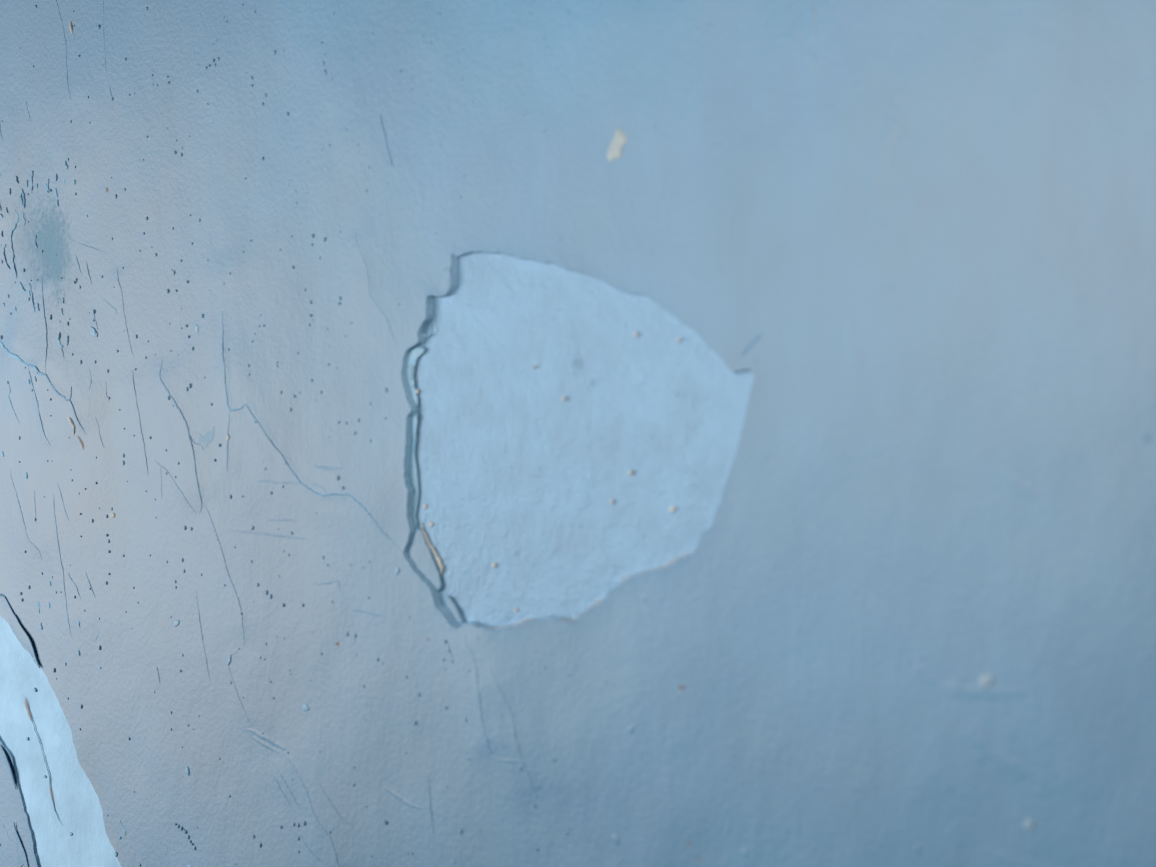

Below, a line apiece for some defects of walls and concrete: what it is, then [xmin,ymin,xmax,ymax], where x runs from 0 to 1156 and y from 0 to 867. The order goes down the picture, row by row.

crack [10,469,72,637]
crack [0,276,86,443]
crack [117,268,404,722]
peeling [395,251,754,631]
peeling [0,594,126,867]